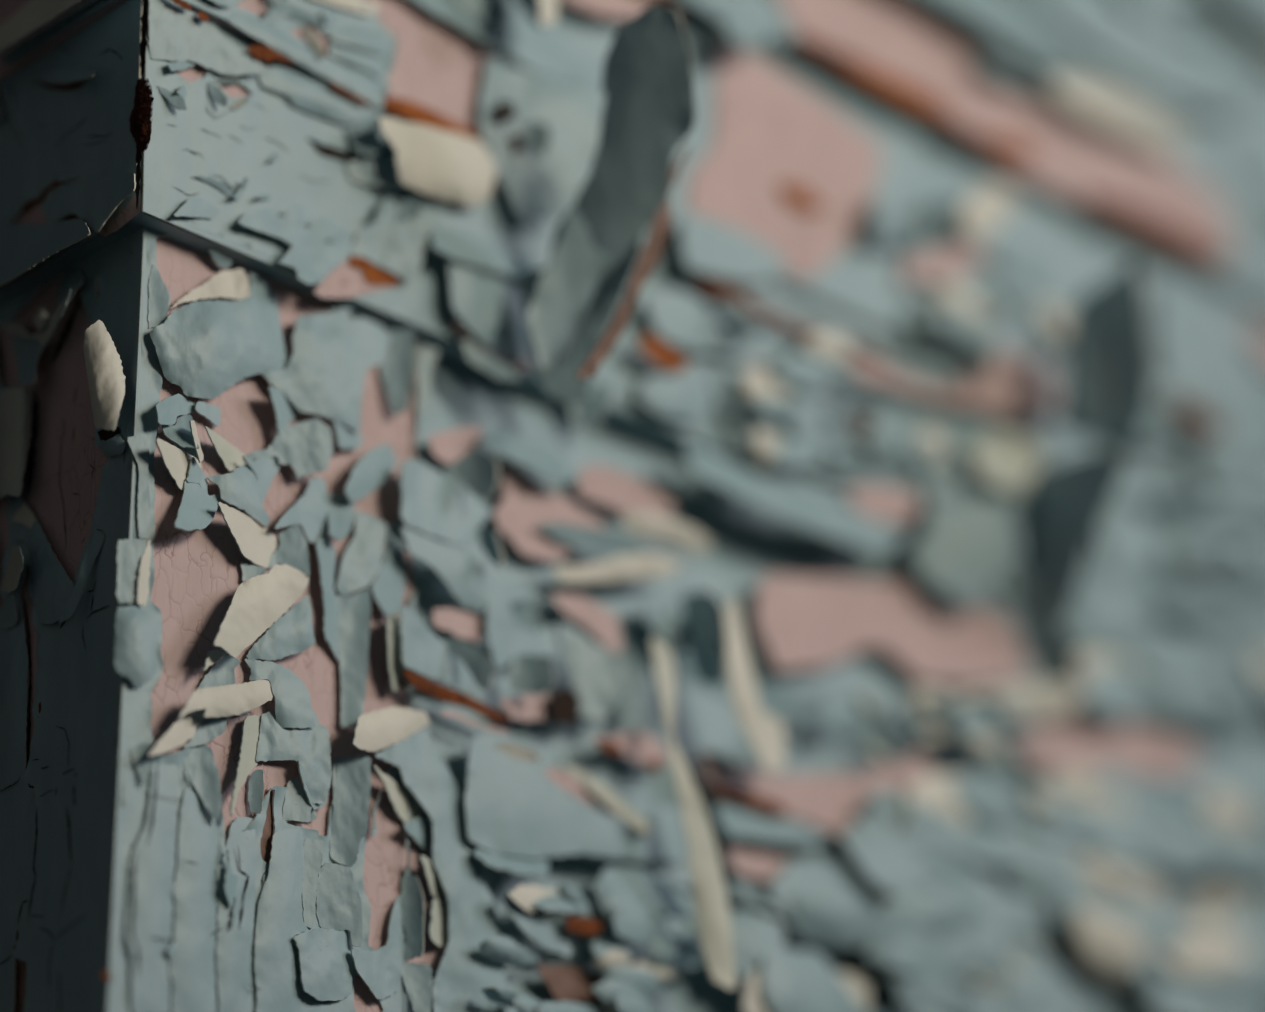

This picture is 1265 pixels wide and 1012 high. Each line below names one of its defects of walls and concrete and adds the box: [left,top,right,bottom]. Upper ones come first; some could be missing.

corrosion [172,0,209,22]
corrosion [247,44,295,63]
corrosion [129,78,154,152]
corrosion [331,81,370,106]
corrosion [384,96,479,140]
peeling [0,0,711,1012]
peeling [636,0,1265,1012]
crack [0,725,76,1012]
crack [213,789,274,934]